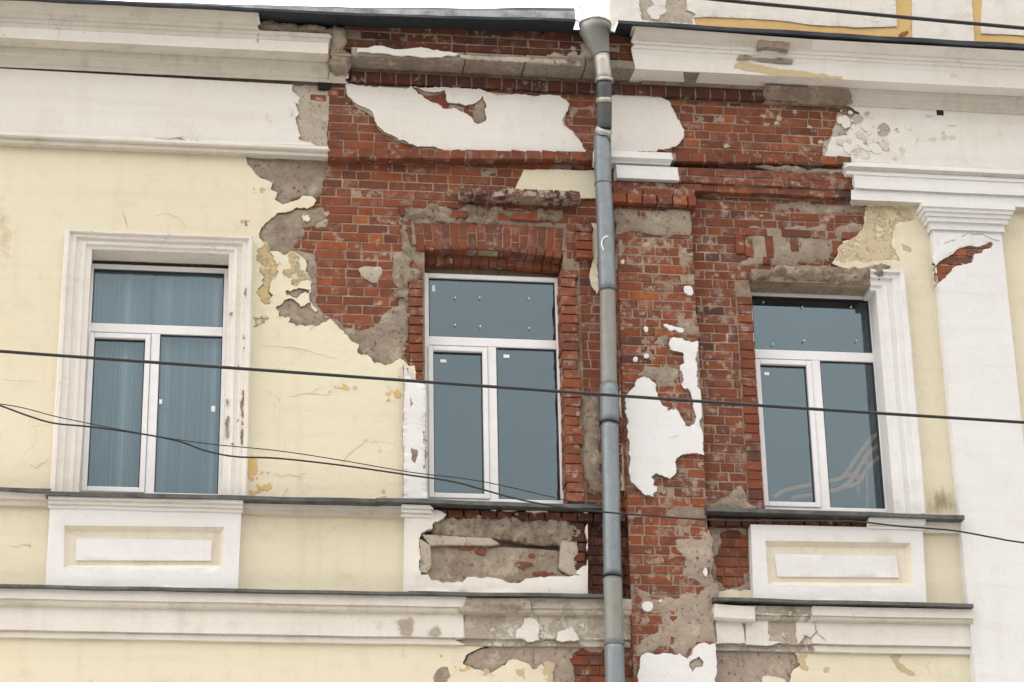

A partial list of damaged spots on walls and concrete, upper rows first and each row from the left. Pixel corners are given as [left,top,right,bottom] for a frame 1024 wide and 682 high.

flaking render [931,233,998,288]
flaking render [244,20,957,682]
peeling [225,390,272,497]